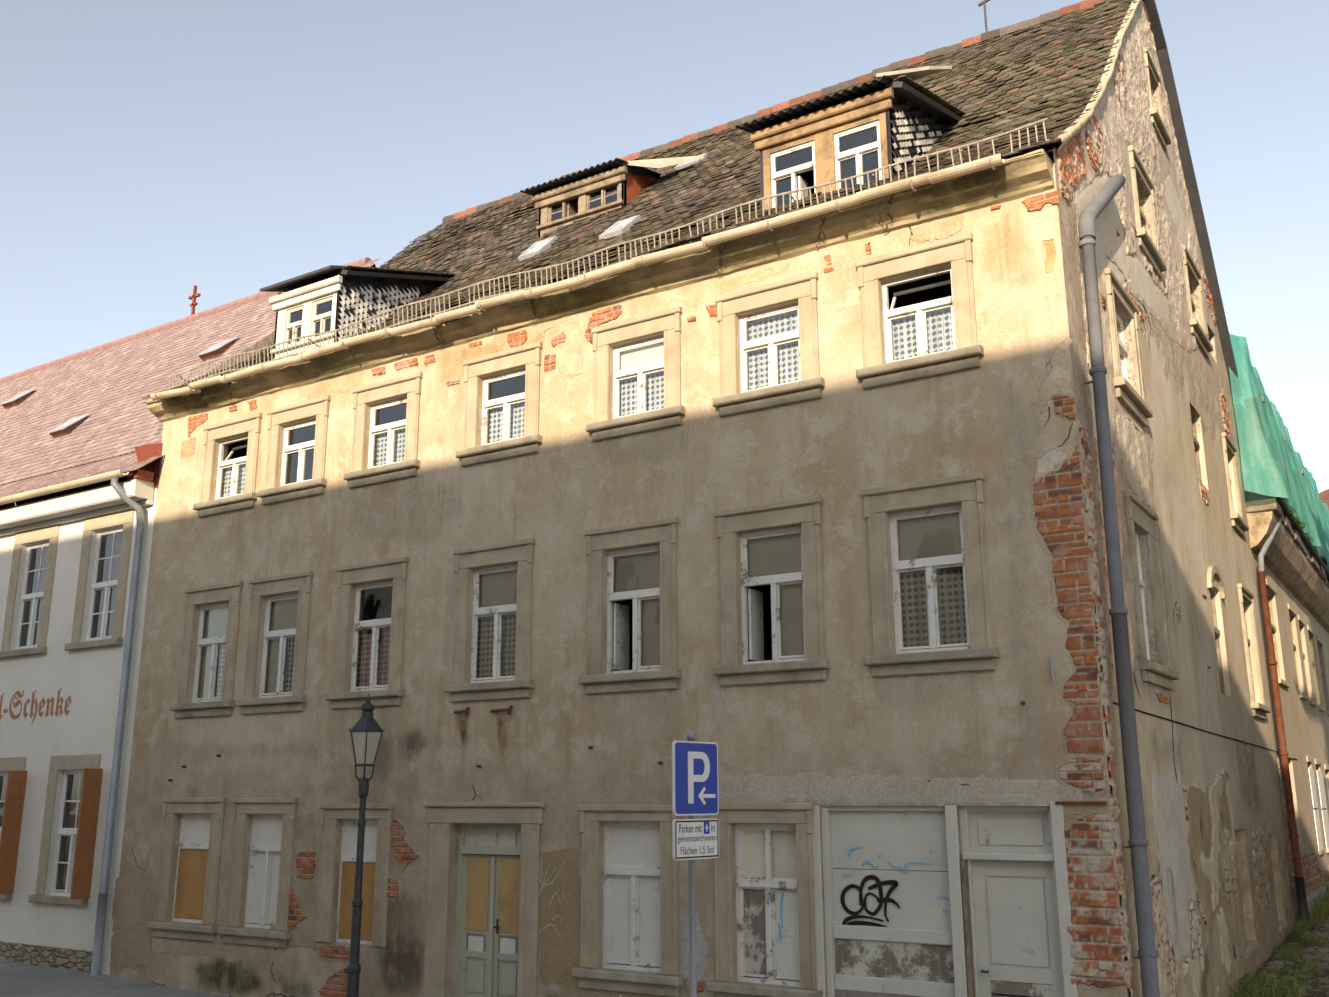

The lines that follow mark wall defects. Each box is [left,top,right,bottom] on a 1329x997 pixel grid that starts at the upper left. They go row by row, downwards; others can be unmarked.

crack [816,211,834,248]
flaking render [1022,0,1217,997]
flaking render [287,848,319,932]
flaking render [387,817,423,902]
flaking render [1149,767,1278,997]
flaking render [317,942,350,997]